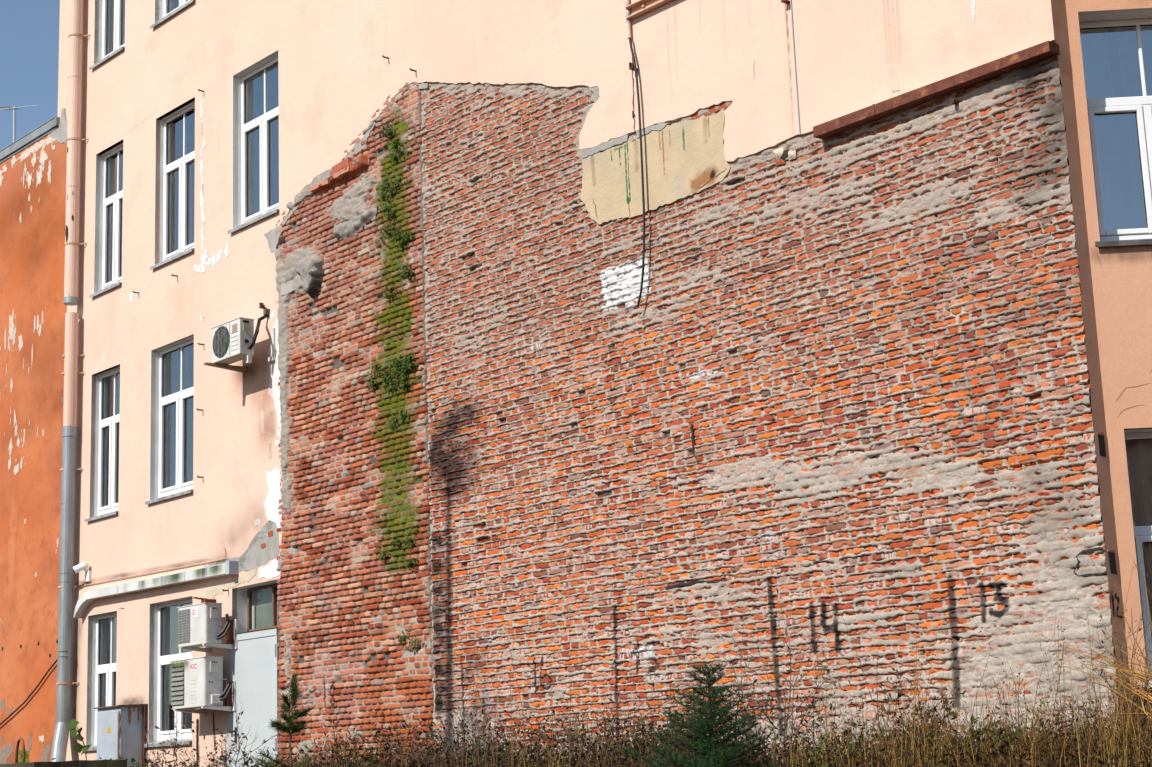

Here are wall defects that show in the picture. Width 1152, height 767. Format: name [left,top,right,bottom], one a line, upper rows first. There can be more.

spalling [0,108,68,225]
peeling [194,97,229,274]
spalling [309,153,373,192]
spalling [280,258,324,299]
peeling [0,307,44,393]
peeling [4,408,44,475]
spalling [200,310,283,599]